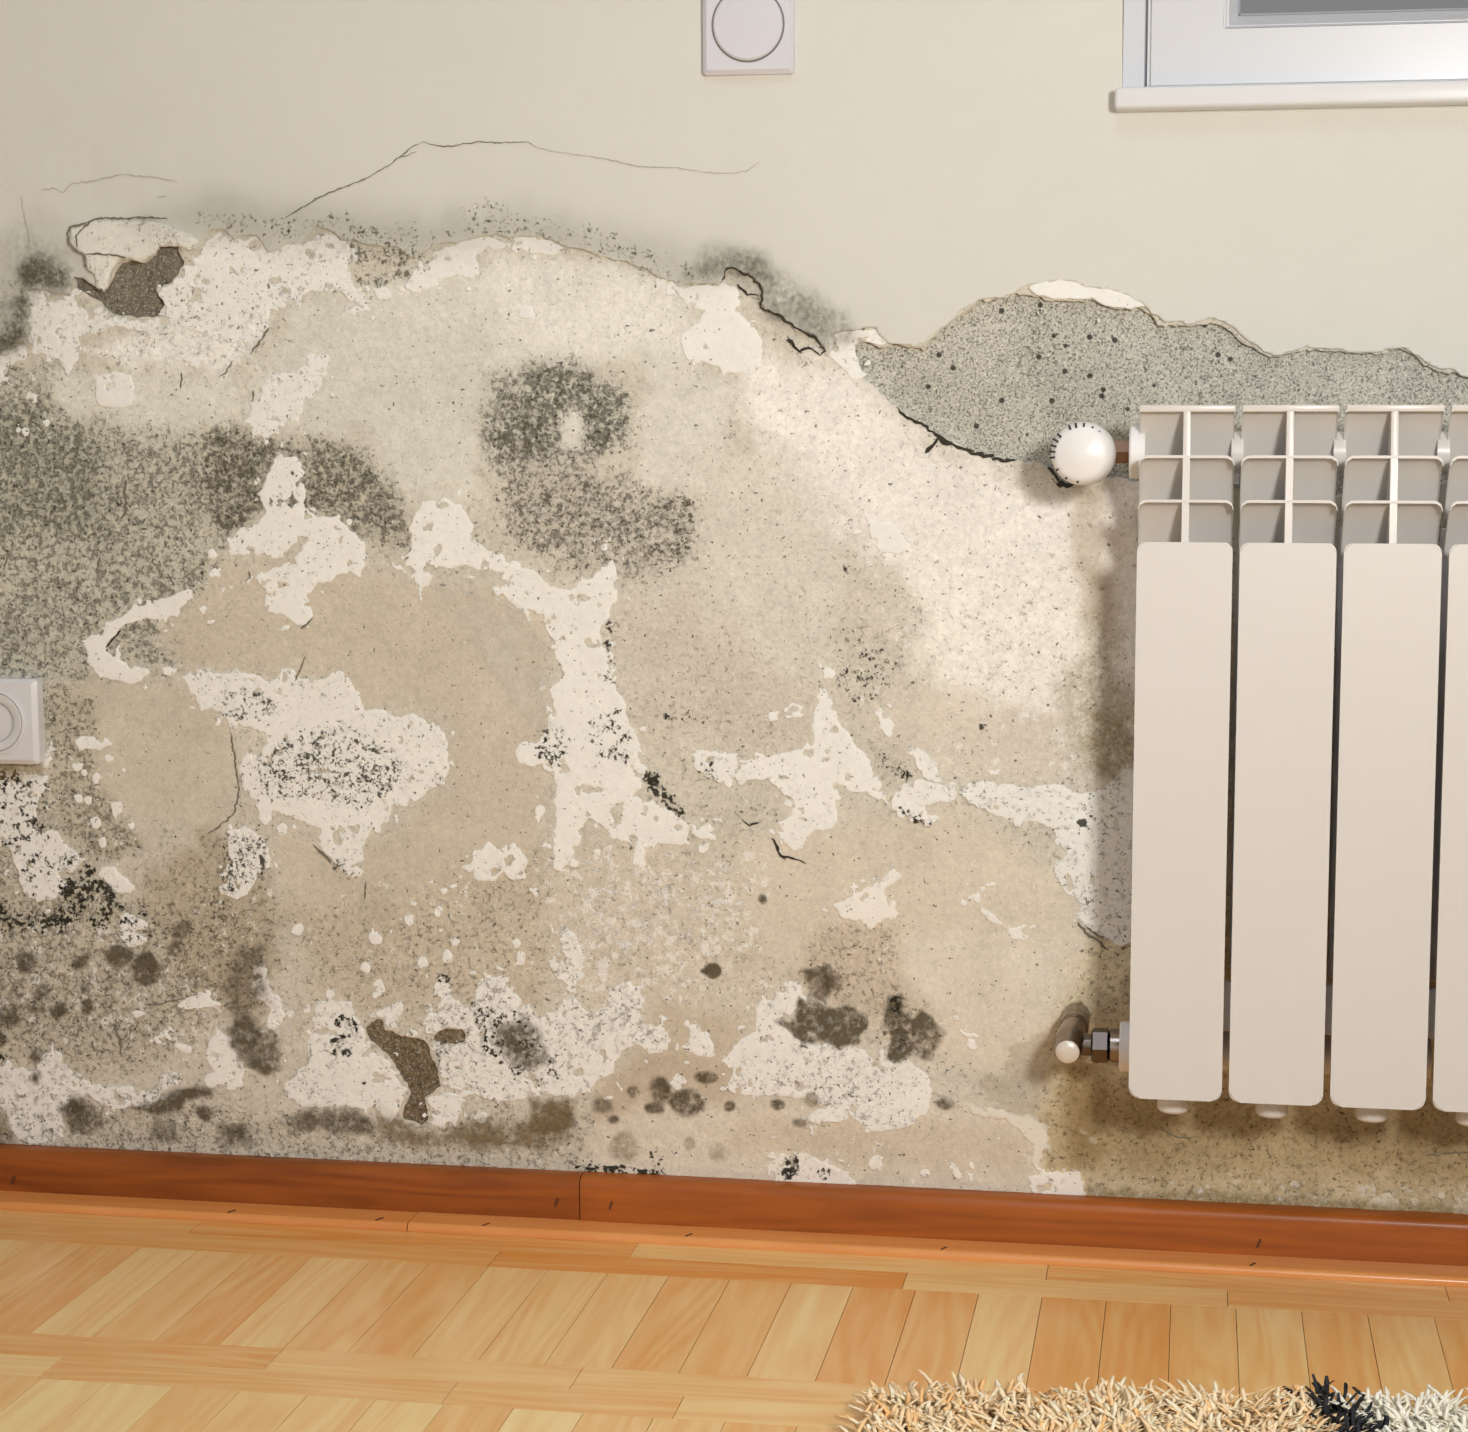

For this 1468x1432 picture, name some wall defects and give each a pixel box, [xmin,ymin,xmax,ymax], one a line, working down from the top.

crack [284,141,756,219]
leakage [496,476,694,569]
flaking render [0,219,1468,1214]
leakage [254,716,403,808]
leakage [0,770,292,1082]
leakage [701,963,721,978]
leakage [326,1014,358,1057]
leakage [471,1002,559,1083]
leakage [779,968,940,1063]
leakage [118,1087,251,1151]
leakage [628,1072,716,1114]
leakage [781,1156,799,1180]